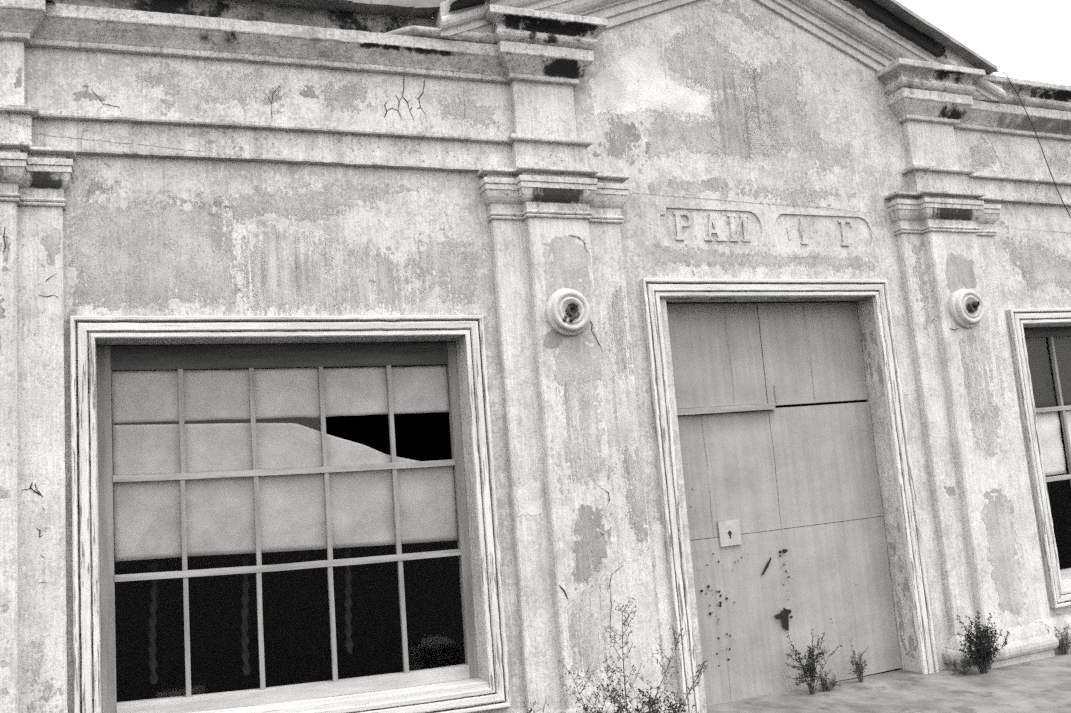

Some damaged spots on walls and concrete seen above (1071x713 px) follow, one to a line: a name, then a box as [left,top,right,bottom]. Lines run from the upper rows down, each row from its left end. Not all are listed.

crack [384,79,426,120]
spalling [0,229,12,318]
spalling [543,233,592,303]
peeling [544,285,650,550]
peeling [564,504,613,685]
peeling [981,488,1027,616]